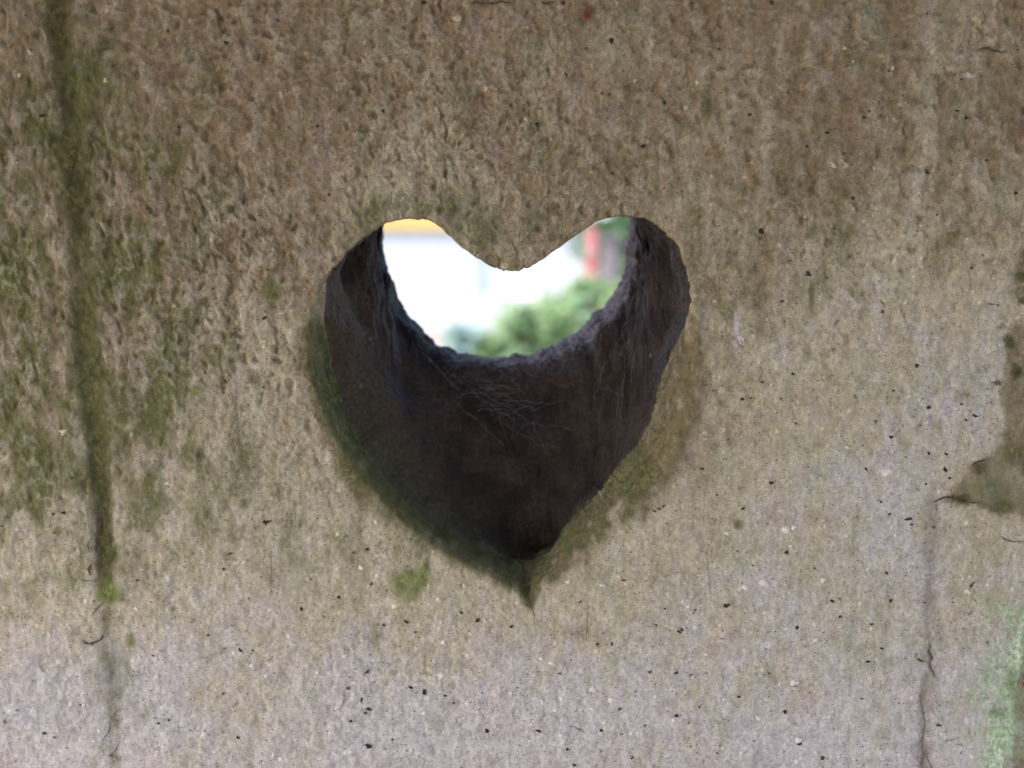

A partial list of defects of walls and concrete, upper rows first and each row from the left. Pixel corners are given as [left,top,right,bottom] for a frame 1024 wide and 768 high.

water stain [77,291,116,583]